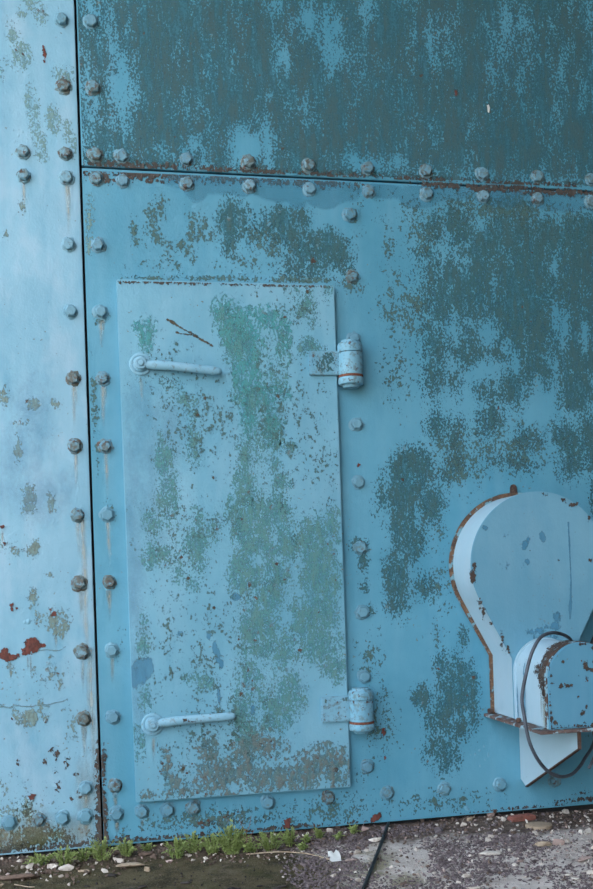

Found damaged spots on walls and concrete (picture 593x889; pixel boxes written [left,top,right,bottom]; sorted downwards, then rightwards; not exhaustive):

peeling [0,0,48,81]
peeling [24,0,593,188]
rust [83,159,593,198]
rust [127,311,338,571]
peeling [118,192,404,763]
peeling [367,187,593,780]
rust [0,637,46,665]
peeling [6,656,73,727]
peeling [28,588,73,640]
rust [143,560,288,769]
rust [533,640,593,730]
rust [0,739,544,853]